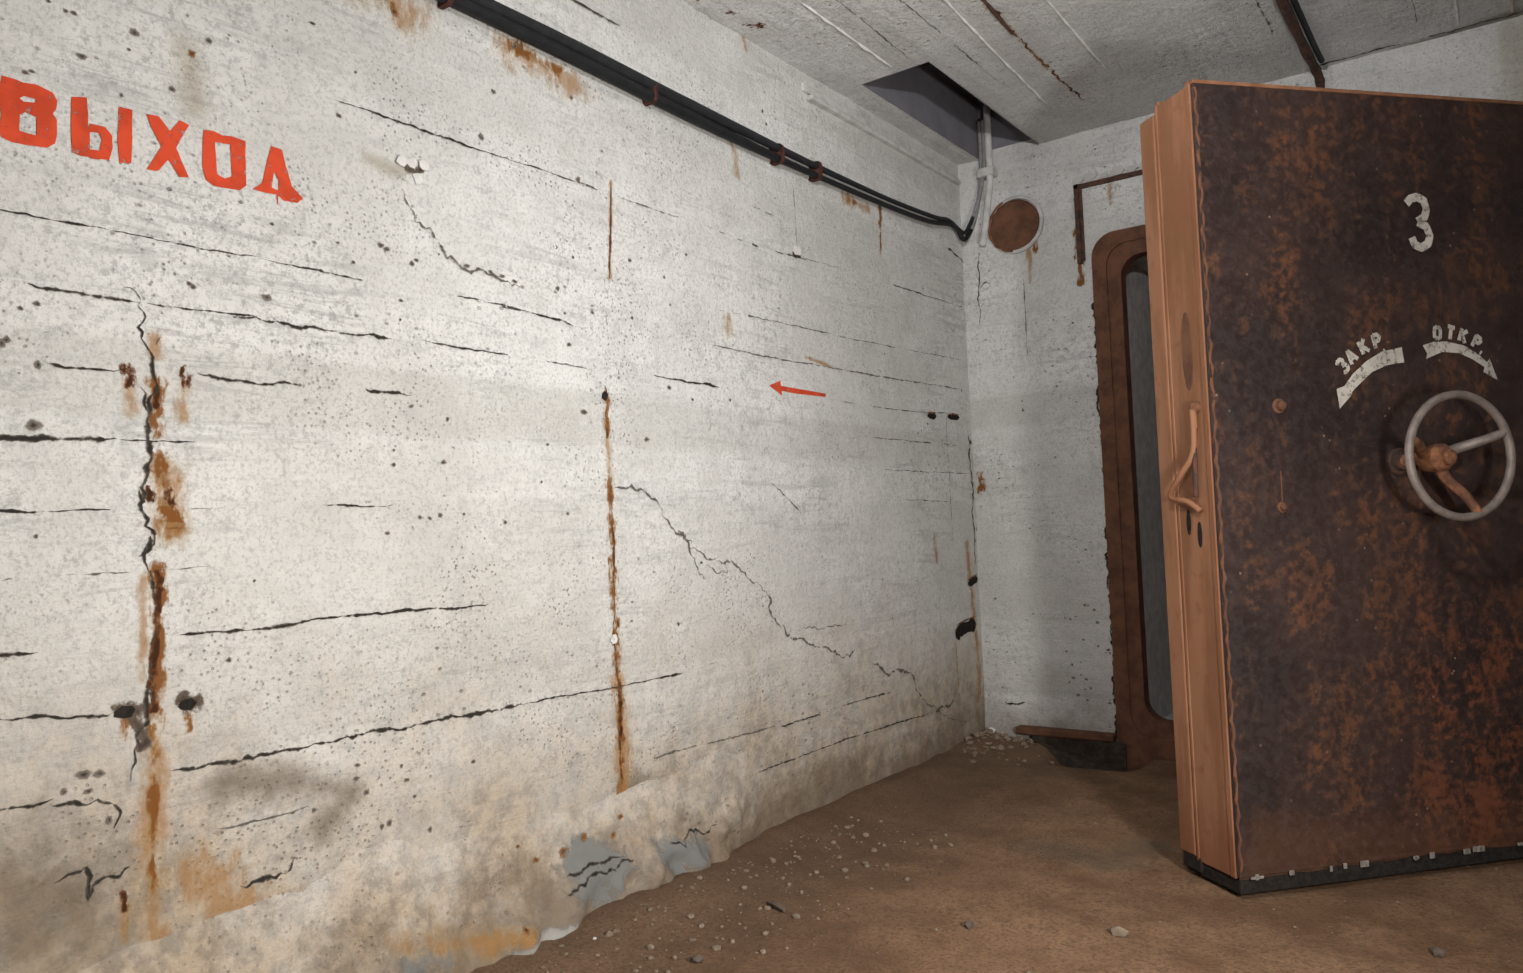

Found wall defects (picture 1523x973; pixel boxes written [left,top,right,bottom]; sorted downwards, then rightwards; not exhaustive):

rust [504,39,579,92]
rust [981,0,1083,100]
crack [334,99,833,279]
crack [0,209,362,281]
crack [458,296,572,326]
rust [119,363,192,539]
crack [0,283,508,829]
crack [172,361,967,794]
rust [141,562,169,941]
damp [182,852,255,917]
spalling [560,814,637,907]
spalling [656,832,711,875]